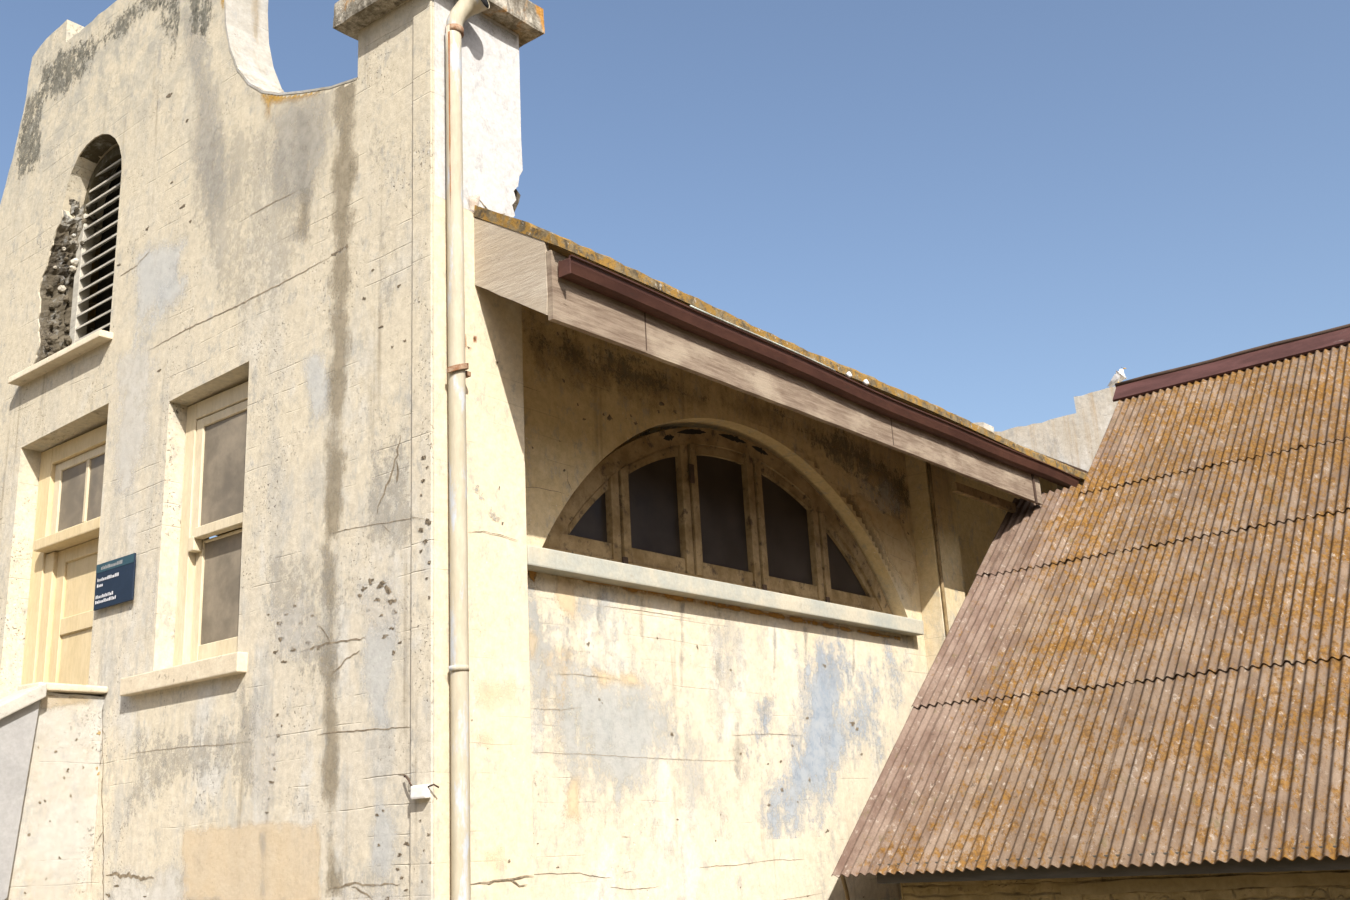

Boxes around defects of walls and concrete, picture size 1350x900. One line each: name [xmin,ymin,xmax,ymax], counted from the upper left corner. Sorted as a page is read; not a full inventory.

damp [15,0,215,179]
damp [275,83,357,609]
crack [335,435,426,533]
damp [319,633,337,801]
crack [301,626,365,676]
damp [327,853,341,892]